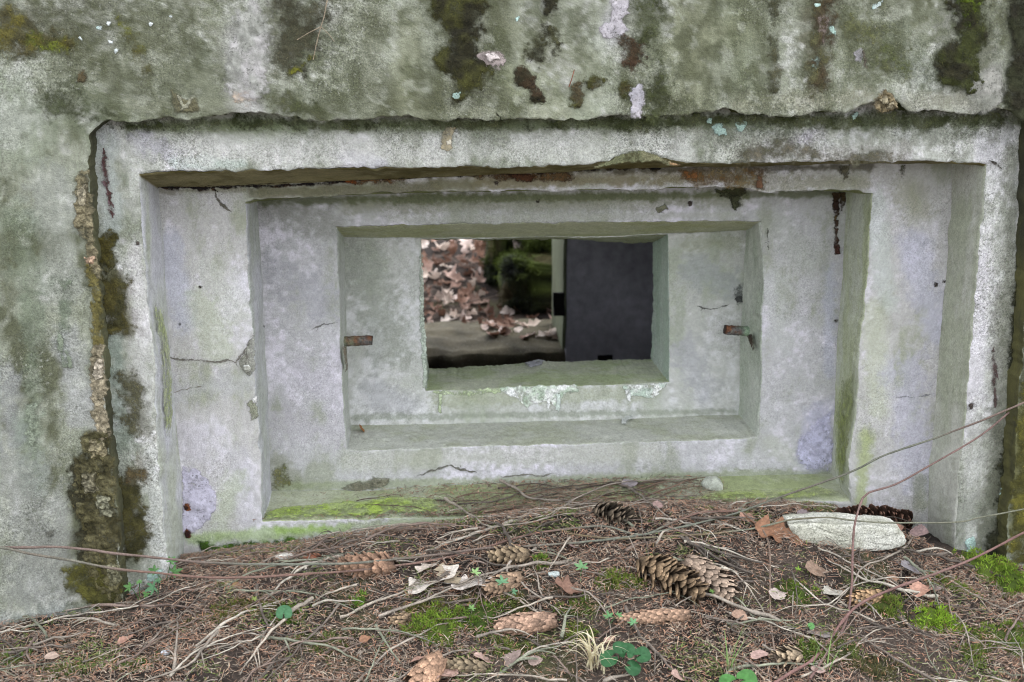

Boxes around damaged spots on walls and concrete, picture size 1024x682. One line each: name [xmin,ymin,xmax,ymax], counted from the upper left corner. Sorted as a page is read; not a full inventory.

spalling [874,89,898,113]
crack [158,175,476,212]
corrosion [476,172,573,182]
crack [510,168,661,177]
corrosion [678,167,767,189]
corrosion [832,192,846,255]
crack [170,341,249,393]
spalling [239,335,256,376]